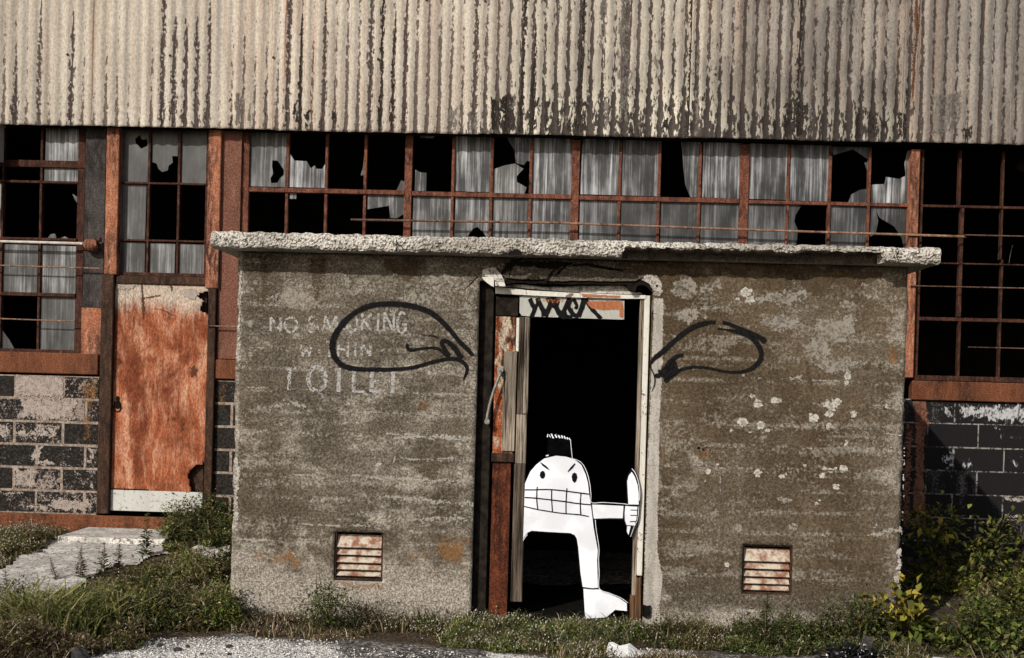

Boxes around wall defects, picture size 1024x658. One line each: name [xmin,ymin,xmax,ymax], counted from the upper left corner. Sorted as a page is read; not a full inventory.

rust [912,0,920,105]
peeling [0,374,96,511]
peeling [482,247,881,625]